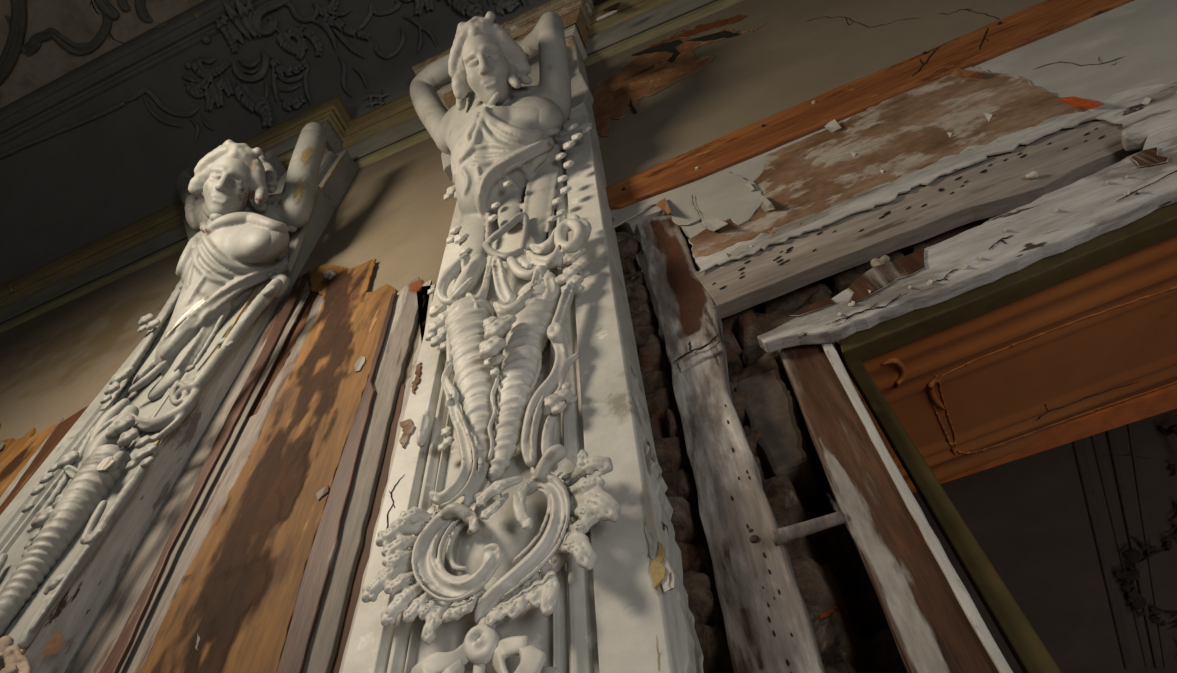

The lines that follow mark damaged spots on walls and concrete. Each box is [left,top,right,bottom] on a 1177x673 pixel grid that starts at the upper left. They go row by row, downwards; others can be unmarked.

flaking render [594,0,628,21]
flaking render [592,28,739,137]
crack [809,9,1000,50]
crack [1035,56,1122,69]
flaking render [610,66,1177,336]
spalling [629,356,704,673]